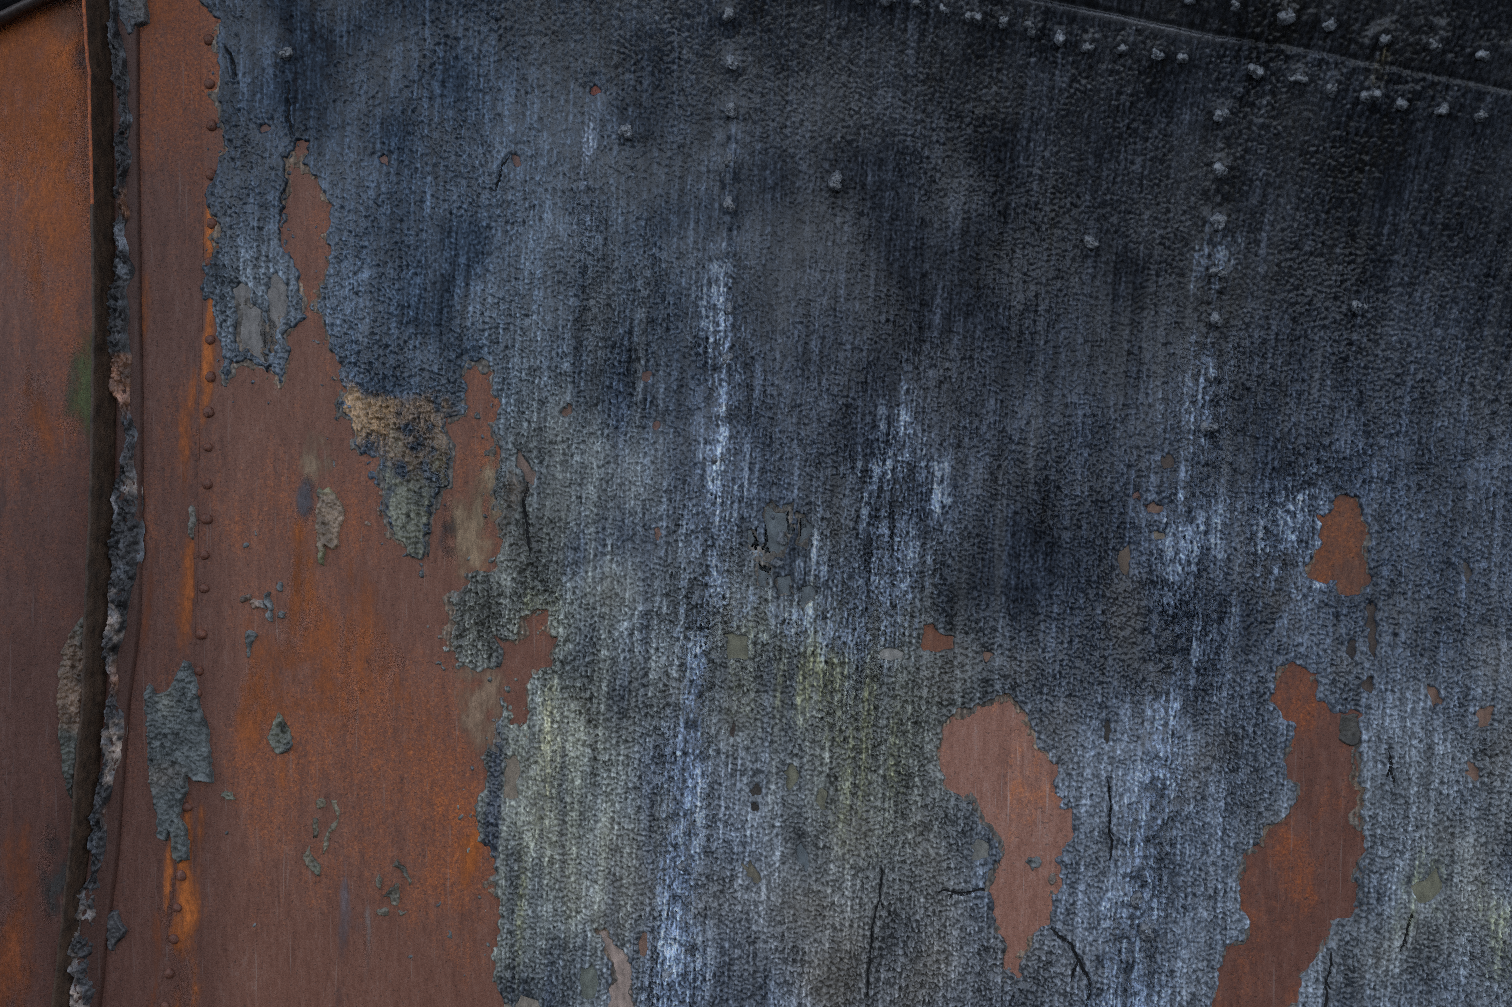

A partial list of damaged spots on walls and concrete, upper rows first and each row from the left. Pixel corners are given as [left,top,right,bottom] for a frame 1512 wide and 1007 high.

rust [190,299,213,405]
peeling [233,273,289,371]
rust [67,0,145,1007]
rust [181,544,194,628]
rust [343,389,450,559]
peeling [1305,495,1377,693]
peeling [143,660,214,866]
rust [166,816,197,937]
peeling [938,695,1074,978]
peeling [1212,662,1366,1007]
peeling [504,995,540,1007]